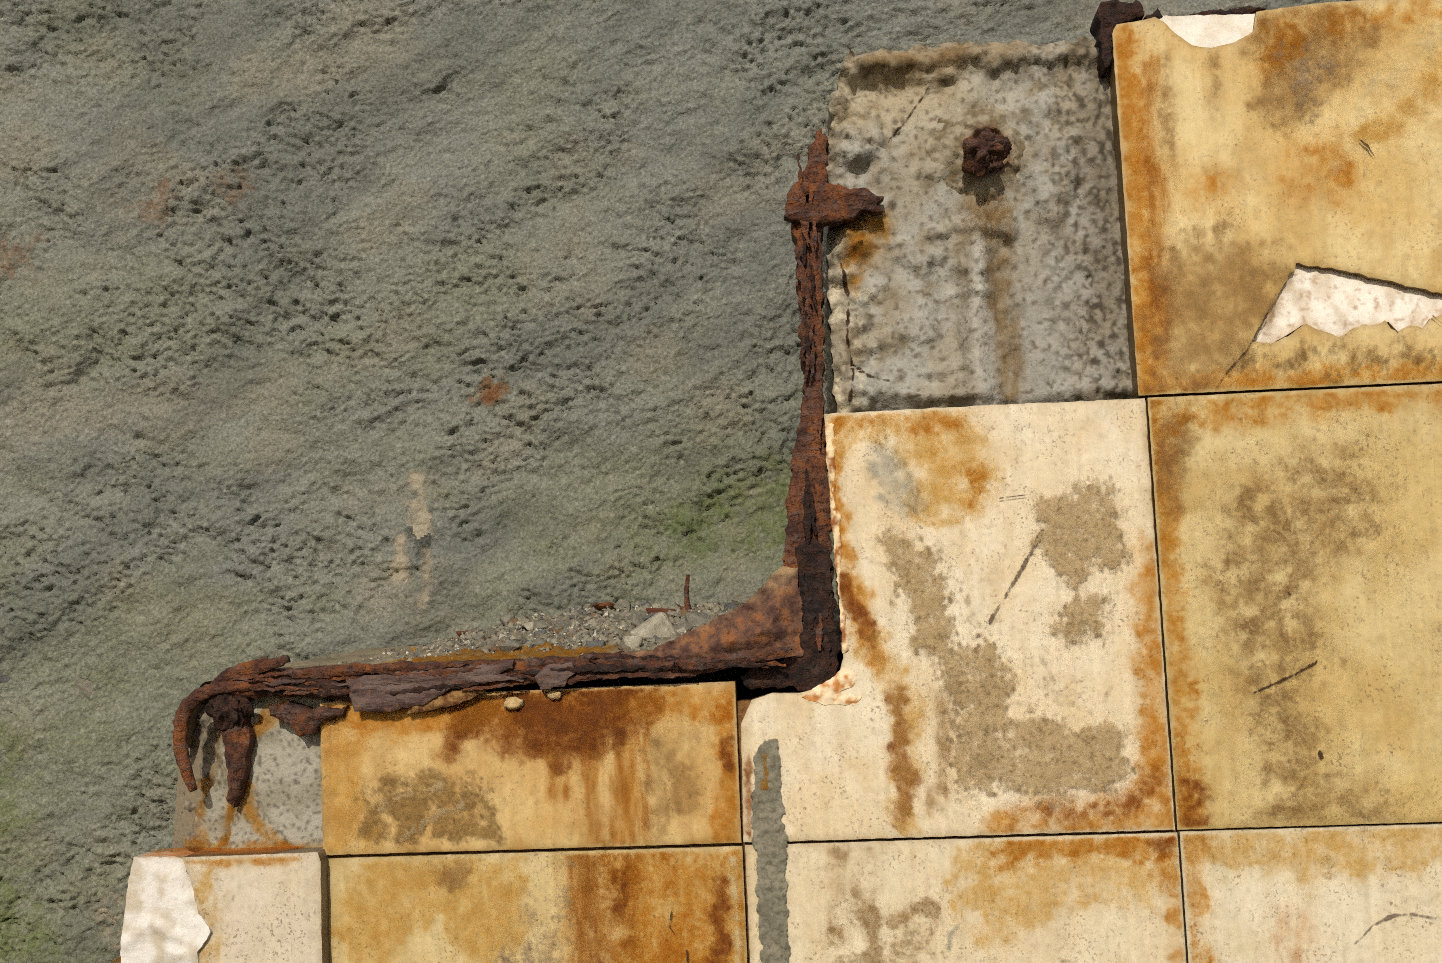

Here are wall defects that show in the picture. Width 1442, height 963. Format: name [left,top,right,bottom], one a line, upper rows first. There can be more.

spalling [1159,14,1255,48]
spalling [1253,265,1442,344]
corrosion [173,128,884,808]
spalling [120,851,212,963]